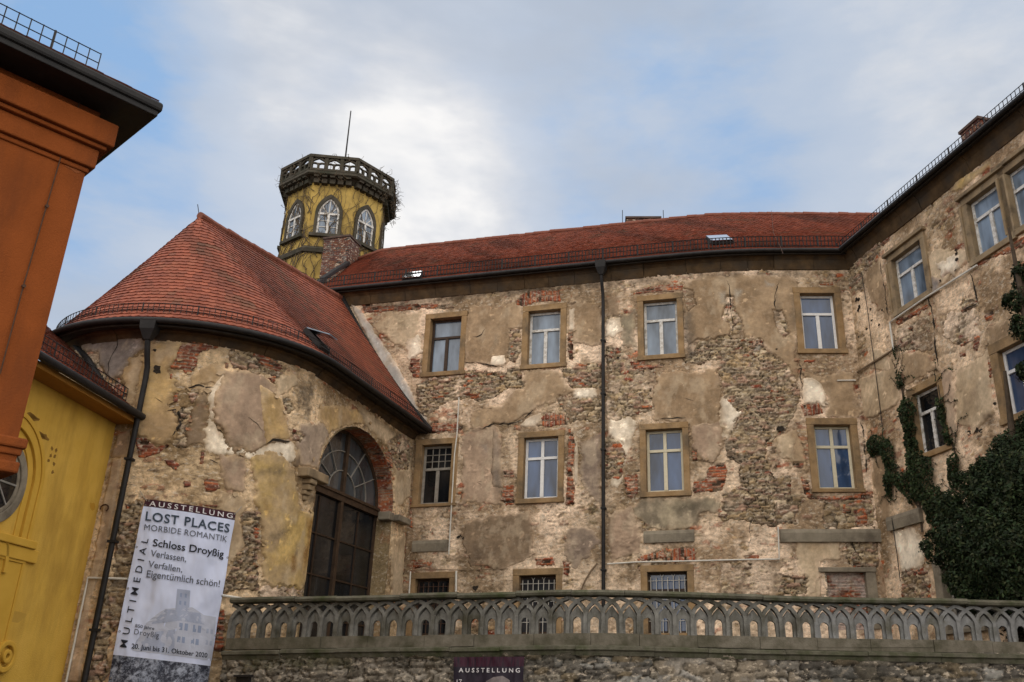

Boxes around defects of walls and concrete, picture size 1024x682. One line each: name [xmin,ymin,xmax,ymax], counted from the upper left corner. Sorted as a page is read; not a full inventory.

flaking render [67,341,452,682]
flaking render [362,237,1024,598]